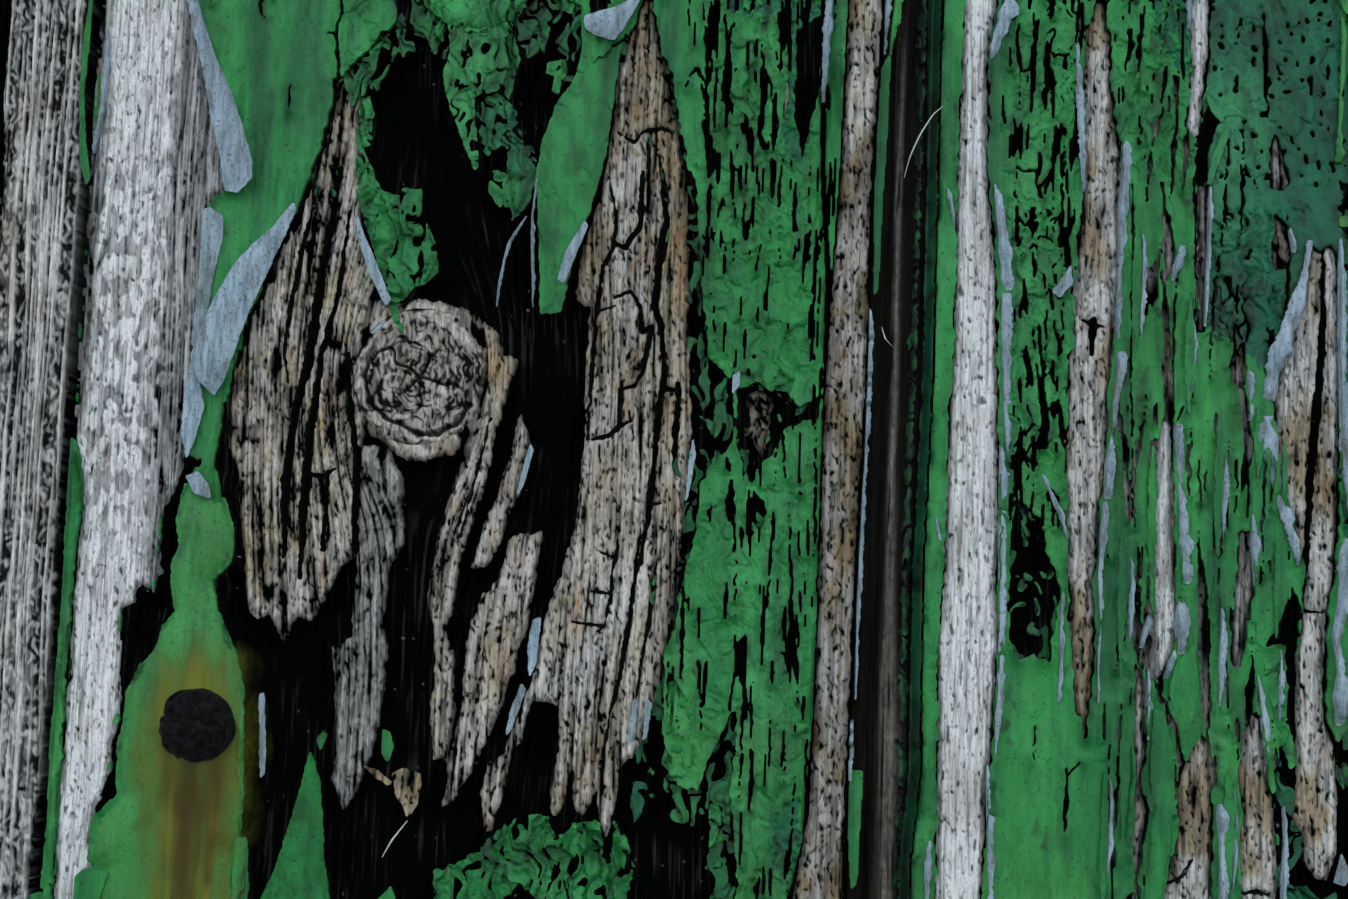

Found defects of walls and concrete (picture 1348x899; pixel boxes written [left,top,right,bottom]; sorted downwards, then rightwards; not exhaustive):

rust [154,652,238,899]
peeling [30,0,696,899]
crack [571,0,713,758]
peeling [730,66,758,120]
peeling [793,0,1020,899]
peeling [1042,0,1348,899]